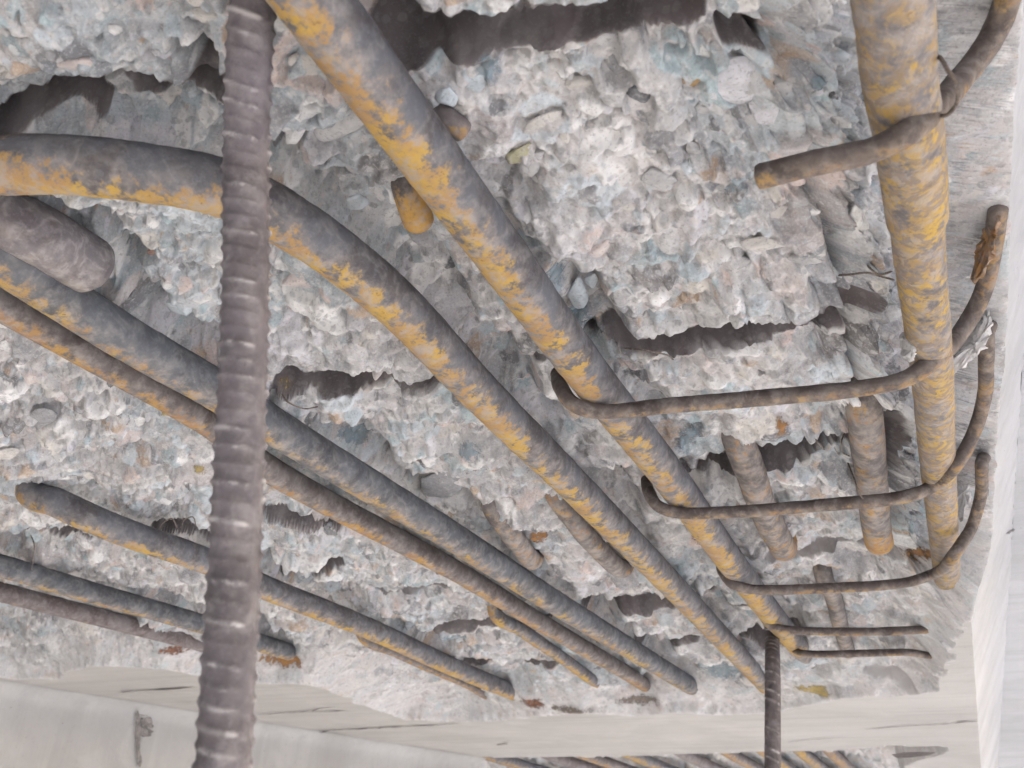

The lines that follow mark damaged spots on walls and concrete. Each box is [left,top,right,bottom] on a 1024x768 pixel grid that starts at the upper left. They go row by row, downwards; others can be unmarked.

spalling [0,0,277,768]
spalling [256,0,1023,768]
corrosion [776,417,788,436]
corrosion [529,532,548,543]
corrosion [899,547,931,564]
corrosion [259,654,301,669]